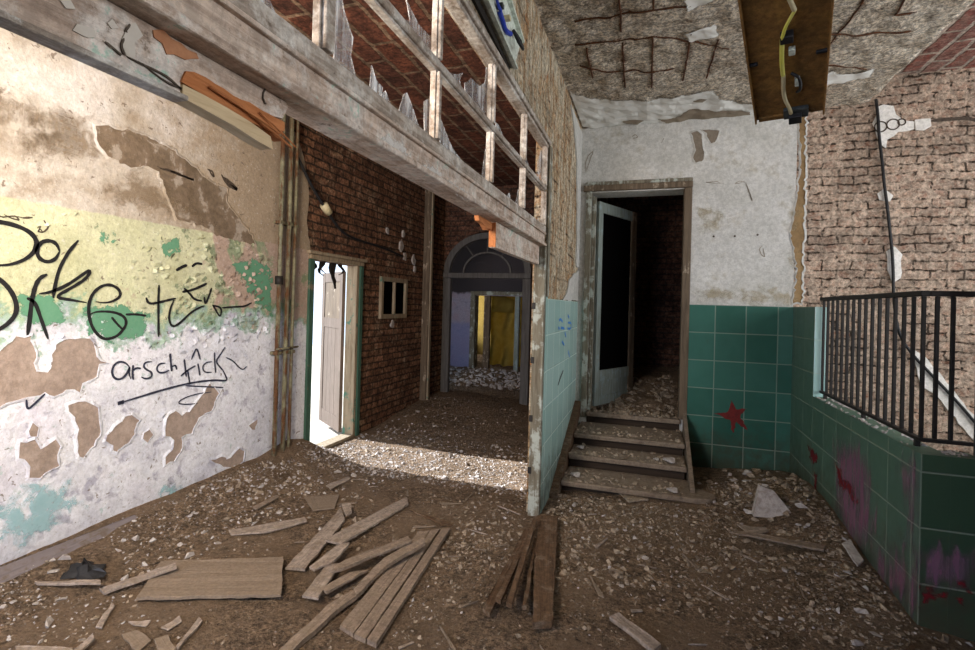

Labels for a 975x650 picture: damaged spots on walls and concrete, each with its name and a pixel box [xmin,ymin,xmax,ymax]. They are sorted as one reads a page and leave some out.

peeling [570,0,754,165]
peeling [827,65,874,85]
peeling [92,122,270,354]
flaking render [0,332,221,481]
flaking render [210,446,246,469]